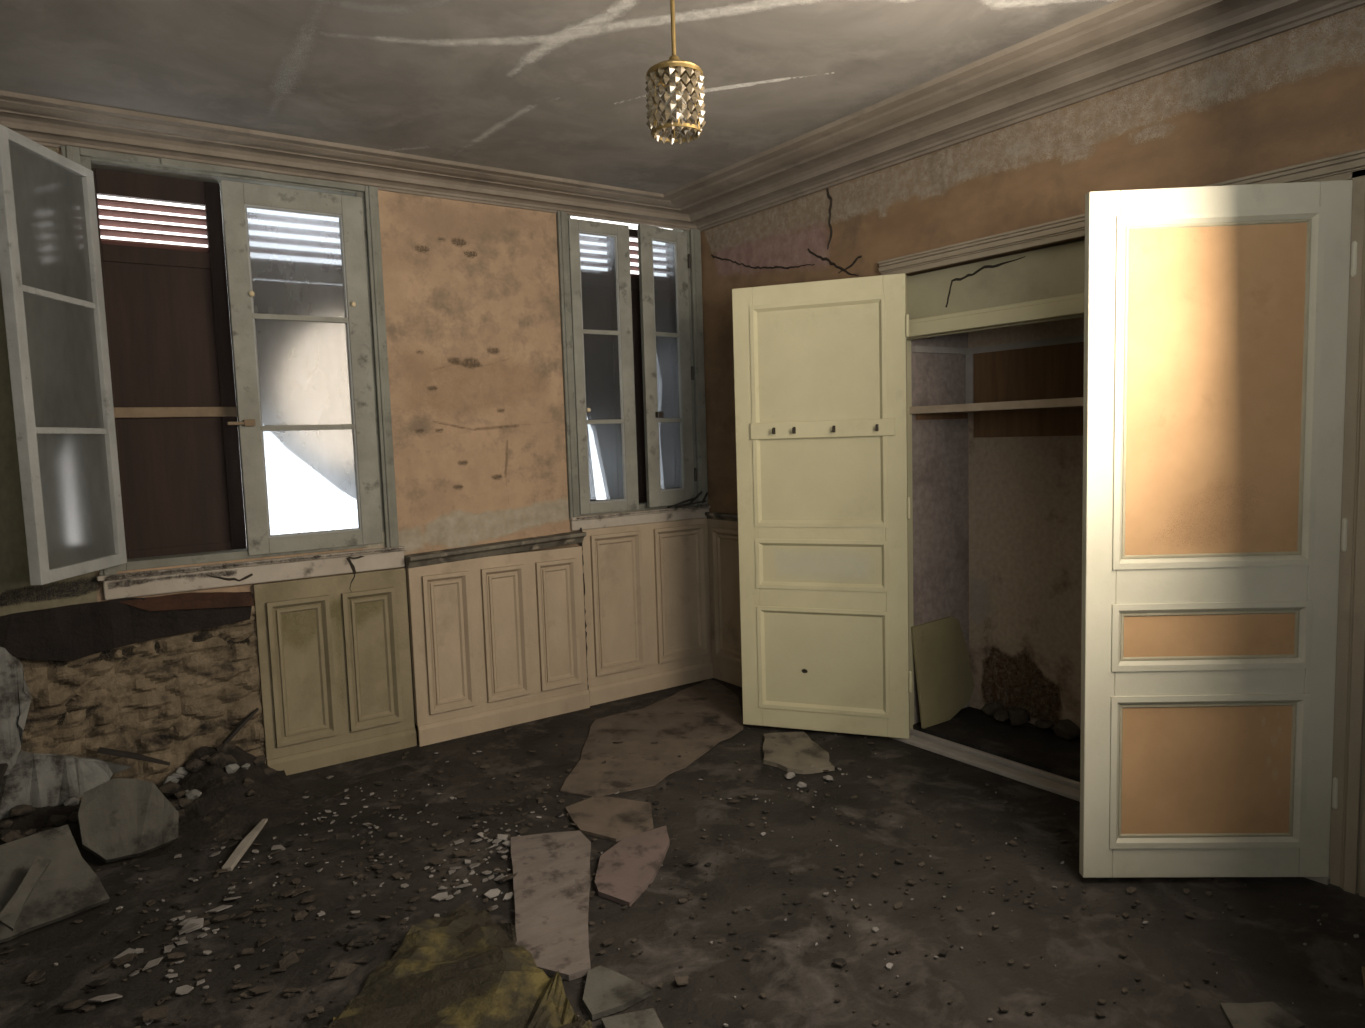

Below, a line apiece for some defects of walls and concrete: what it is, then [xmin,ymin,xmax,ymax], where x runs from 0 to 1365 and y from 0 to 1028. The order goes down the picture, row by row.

crack [980,0,1115,10]
crack [320,0,914,77]
crack [614,72,834,104]
crack [388,98,561,155]
crack [711,188,862,276]
crack [945,256,1025,308]
flaking render [0,592,266,819]